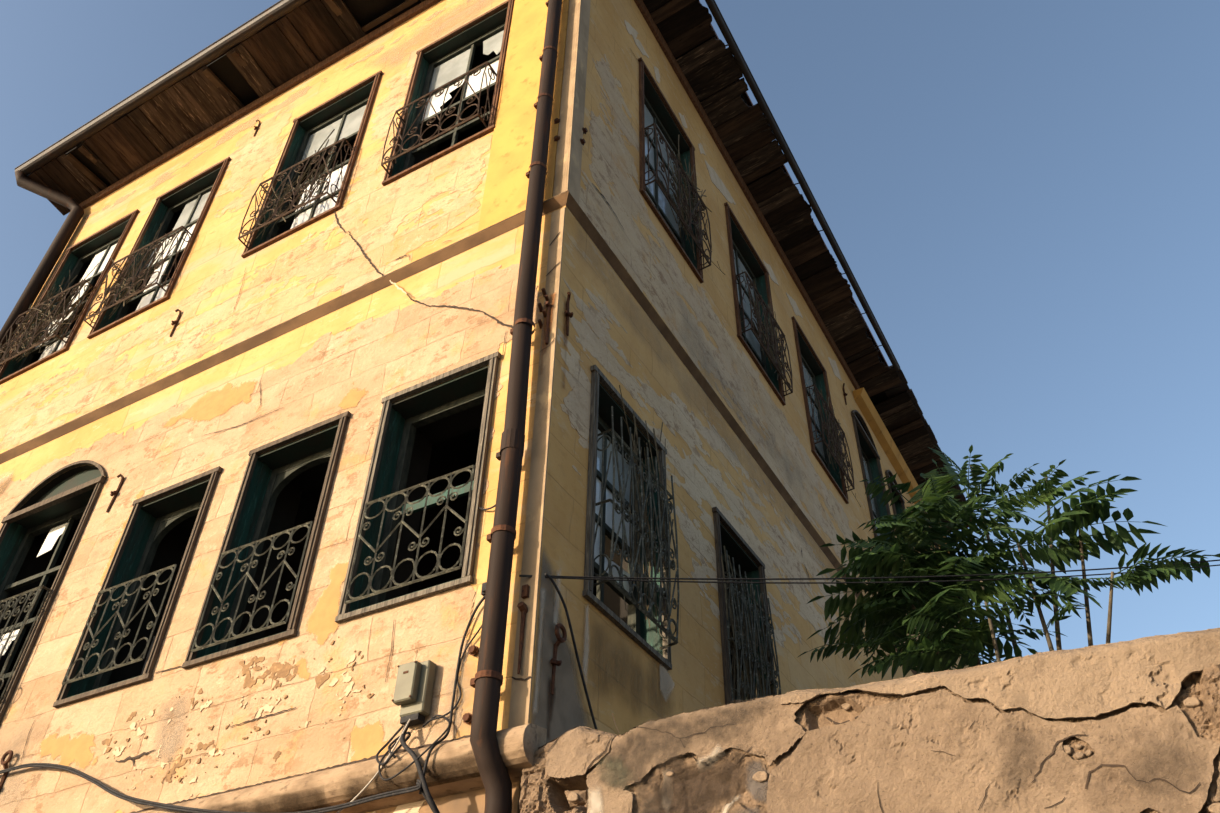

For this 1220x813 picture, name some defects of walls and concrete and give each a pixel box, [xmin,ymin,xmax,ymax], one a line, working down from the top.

peeling [0,64,492,451]
crack [333,211,513,356]
peeling [532,285,544,326]
peeling [0,264,520,813]
flaking render [1171,665,1220,743]
flaking render [1063,740,1095,760]
flaking render [524,778,589,813]
flaking render [635,752,769,813]
flaking render [1206,803,1220,813]